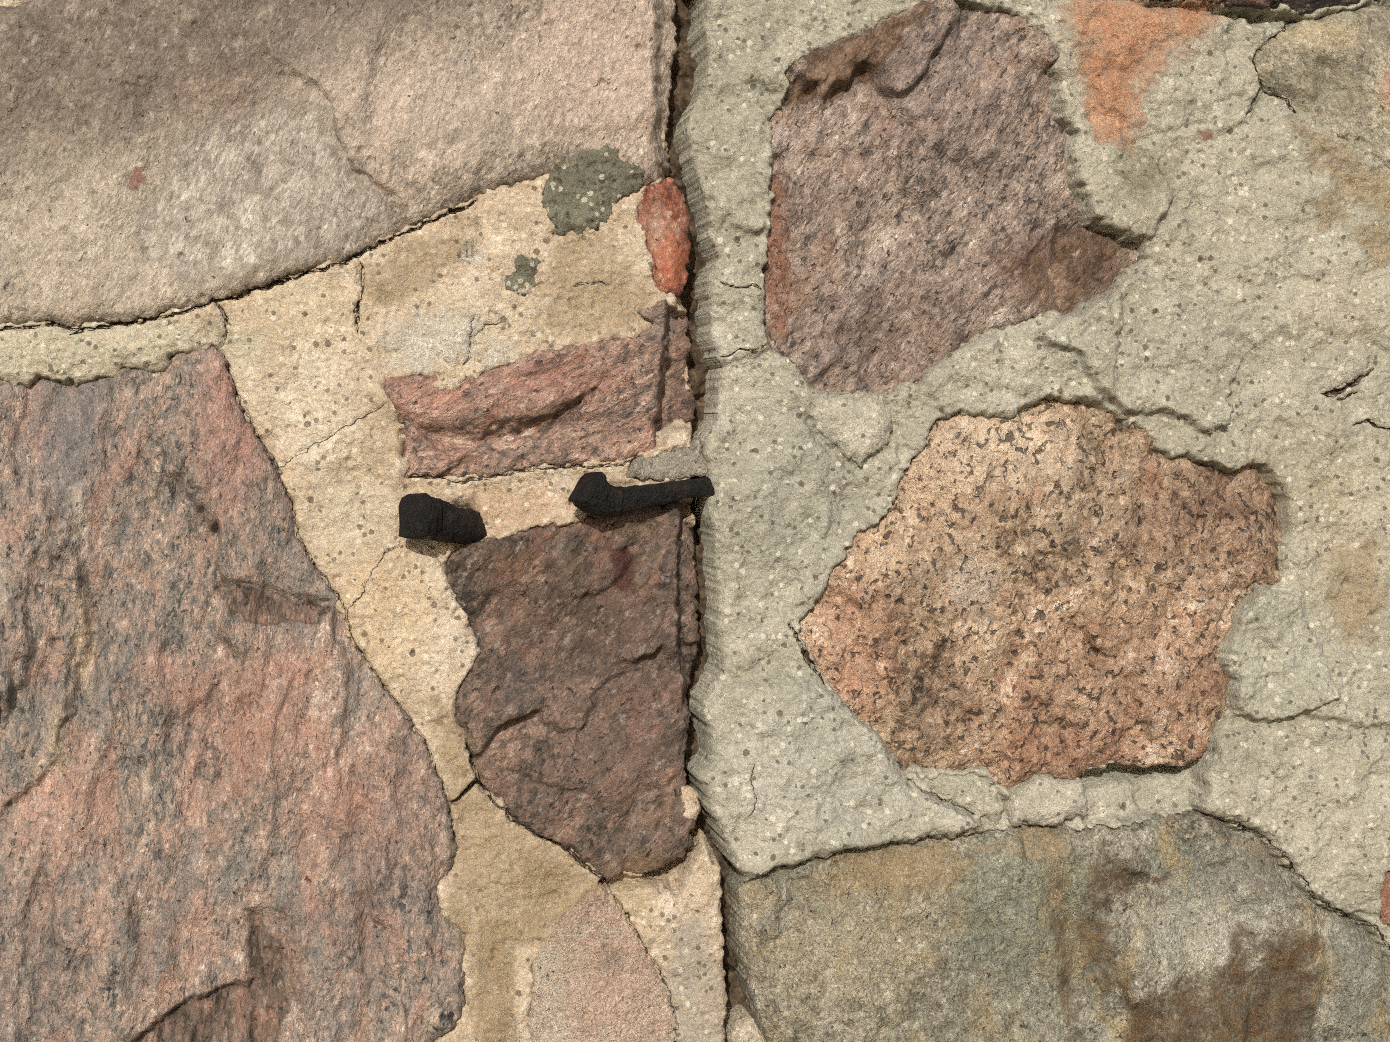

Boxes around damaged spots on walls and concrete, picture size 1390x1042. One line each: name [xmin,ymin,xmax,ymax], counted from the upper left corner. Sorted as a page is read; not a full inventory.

crack [664,0,767,436]
crack [684,476,754,1019]